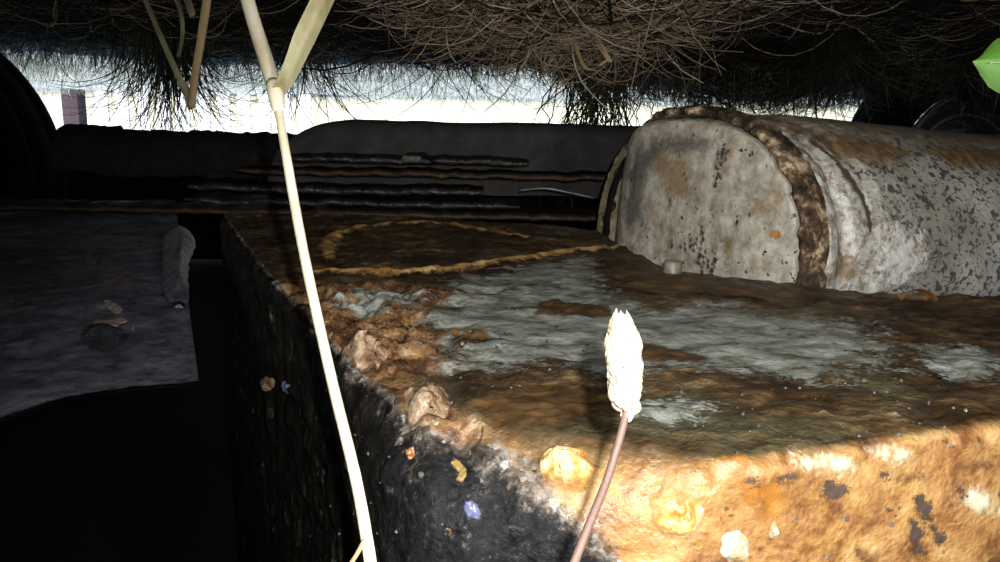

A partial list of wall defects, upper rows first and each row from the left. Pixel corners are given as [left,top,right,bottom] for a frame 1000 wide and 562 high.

corrosion [463,386,677,455]
corrosion [733,479,786,523]
spalling [815,480,851,502]
spalling [909,492,947,557]